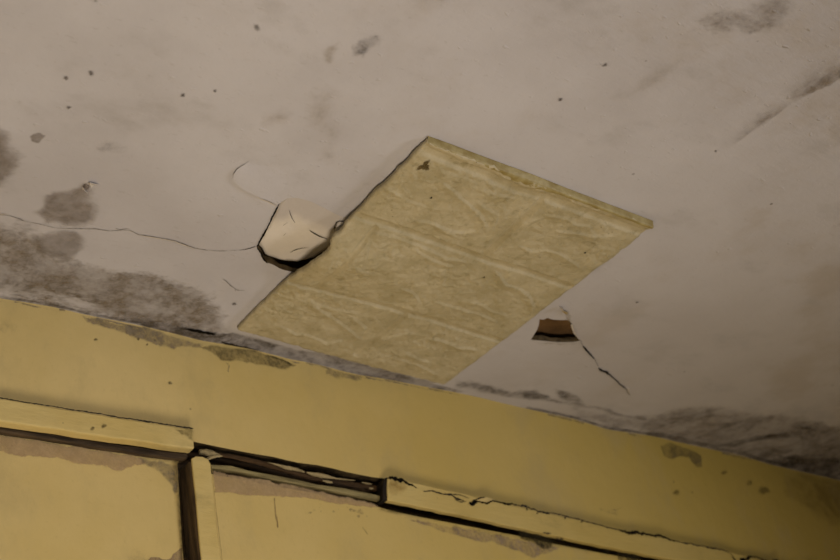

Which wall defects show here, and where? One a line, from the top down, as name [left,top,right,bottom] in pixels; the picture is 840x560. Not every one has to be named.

crack [98,228,210,251]
flaking render [245,198,346,272]
crack [582,344,629,394]
peeling [0,437,178,492]
crack [389,476,730,553]